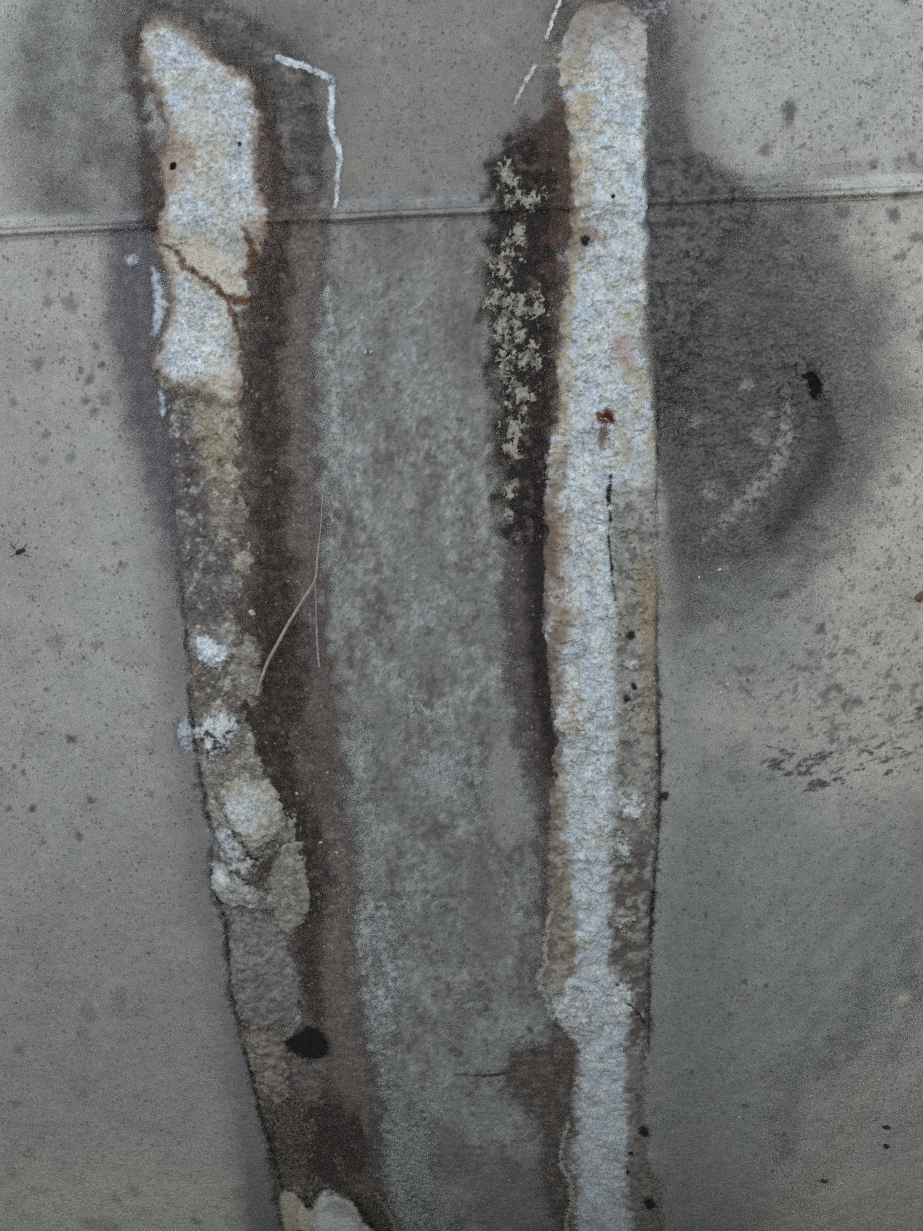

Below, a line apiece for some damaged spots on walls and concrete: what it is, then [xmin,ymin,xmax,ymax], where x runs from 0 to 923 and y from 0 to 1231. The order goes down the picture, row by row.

spalling [158,377,372,1228]
water stain [318,286,342,564]
peeling [476,133,558,546]
water stain [535,0,671,1231]
water stain [348,895,448,1231]